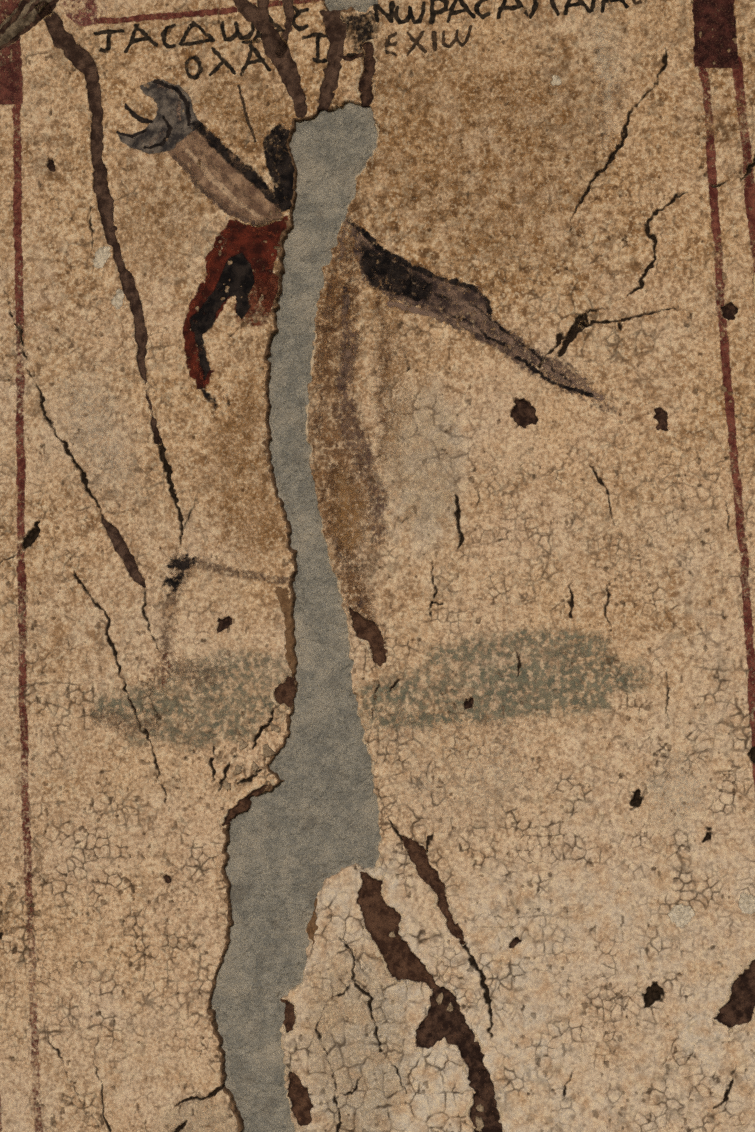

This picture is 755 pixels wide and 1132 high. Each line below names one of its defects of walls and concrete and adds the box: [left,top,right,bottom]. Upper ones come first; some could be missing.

crack [570,48,667,230]
crack [0,0,192,544]
crack [538,193,685,368]
crack [4,292,158,649]
crack [70,559,167,802]
spalling [209,587,298,828]
crack [175,0,493,1132]
spalling [349,608,387,670]
spalling [280,999,298,1035]
spalling [284,1067,313,1126]
spalling [357,871,505,1132]
spalling [712,957,755,1032]